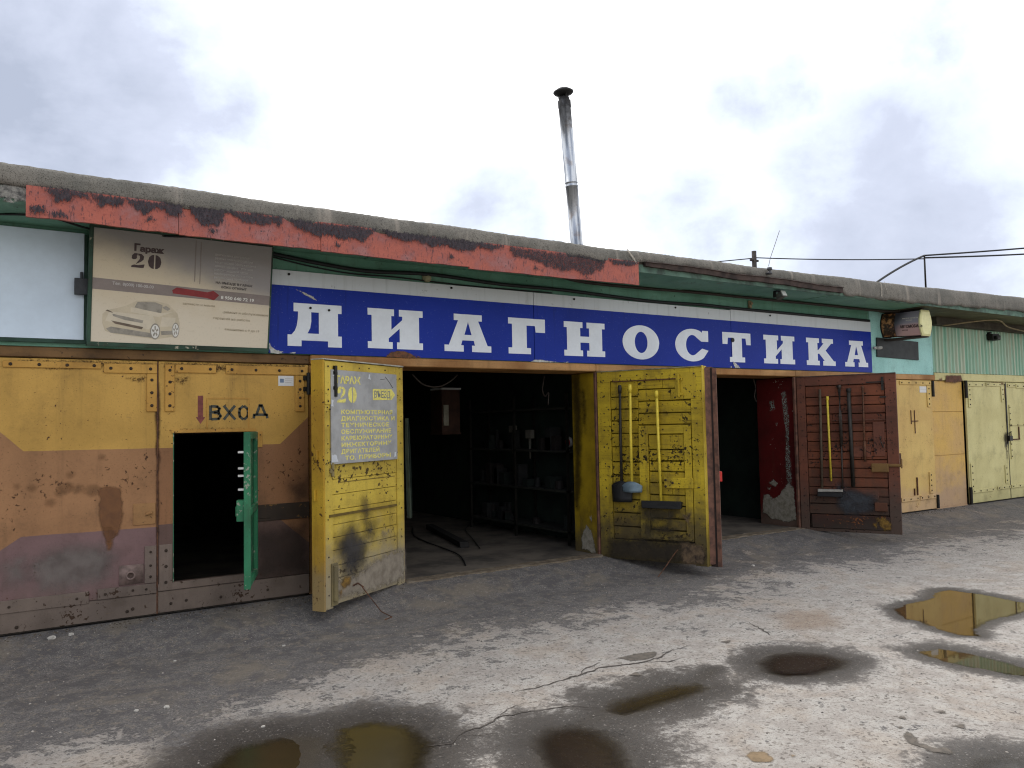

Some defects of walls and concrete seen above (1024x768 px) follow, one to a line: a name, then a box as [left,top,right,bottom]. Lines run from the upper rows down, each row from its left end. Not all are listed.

peeling [0,184,638,279]
flaking render [763,391,797,522]
crack [429,646,685,746]